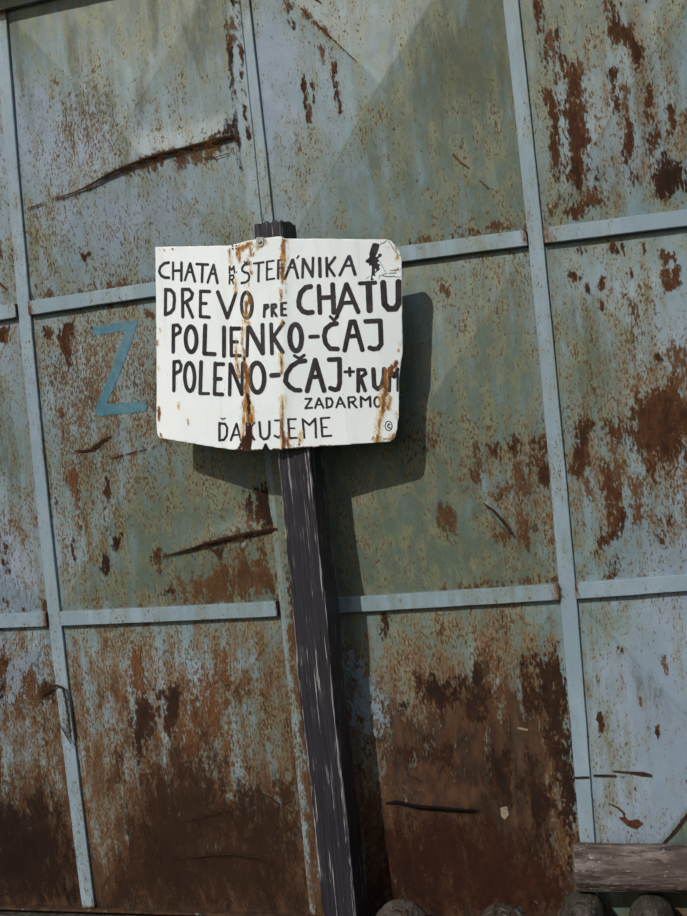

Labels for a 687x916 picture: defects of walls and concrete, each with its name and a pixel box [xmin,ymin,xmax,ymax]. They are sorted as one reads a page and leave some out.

crack [27,134,238,210]
rust [115,0,251,177]
rust [300,72,315,123]
rust [318,44,341,113]
rust [533,0,602,220]
rust [602,0,646,73]
rust [607,65,687,200]
rust [567,339,687,580]
crack [161,525,278,559]
rust [107,482,323,916]
crack [385,800,478,812]
rust [485,641,579,873]